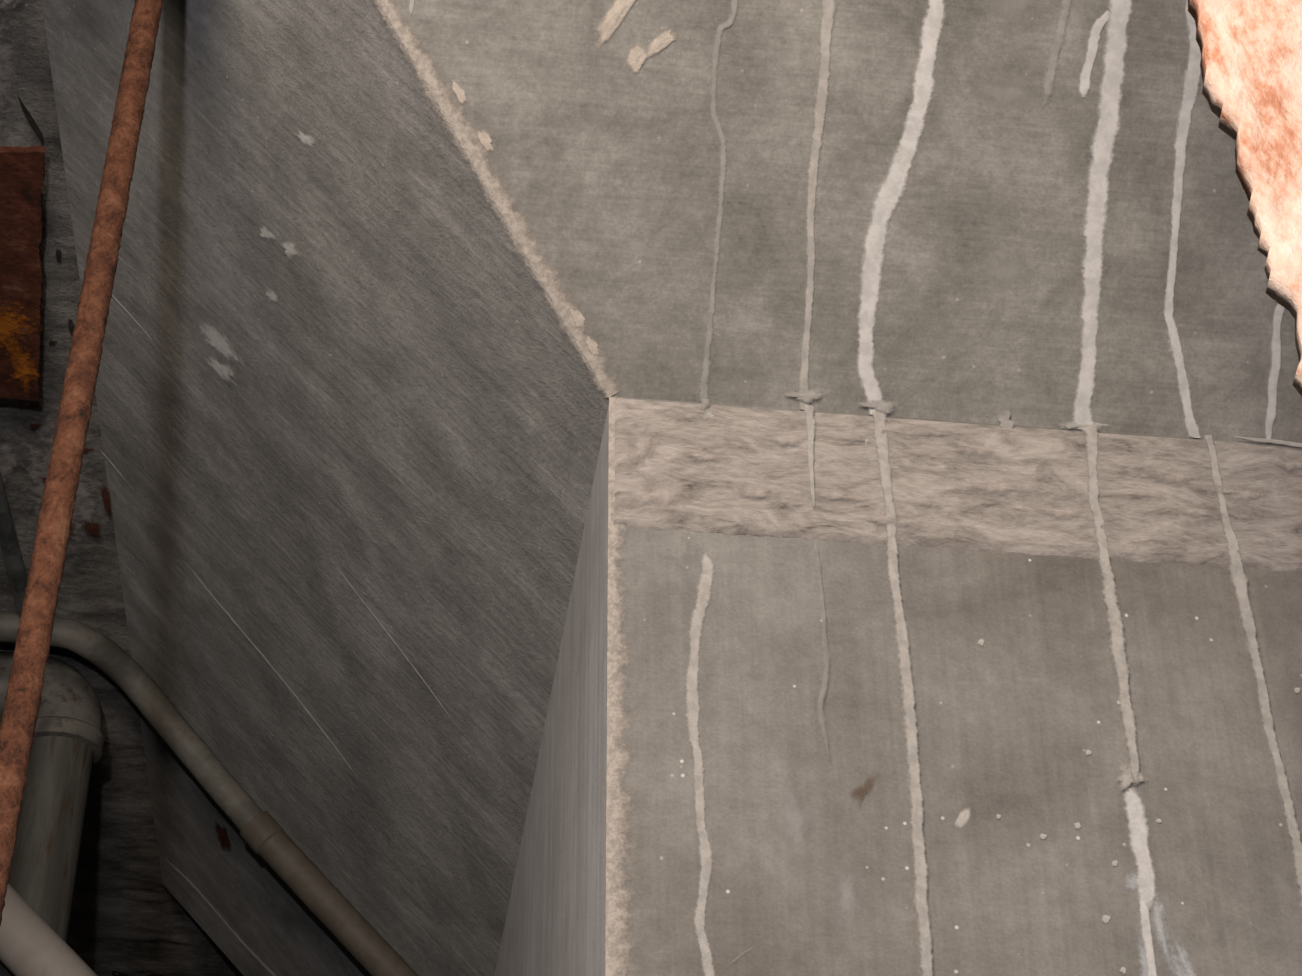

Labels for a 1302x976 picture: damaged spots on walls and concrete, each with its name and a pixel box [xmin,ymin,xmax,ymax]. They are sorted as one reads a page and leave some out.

water stain [1061,0,1196,976]
water stain [1164,0,1302,906]
crack [1232,436,1302,447]